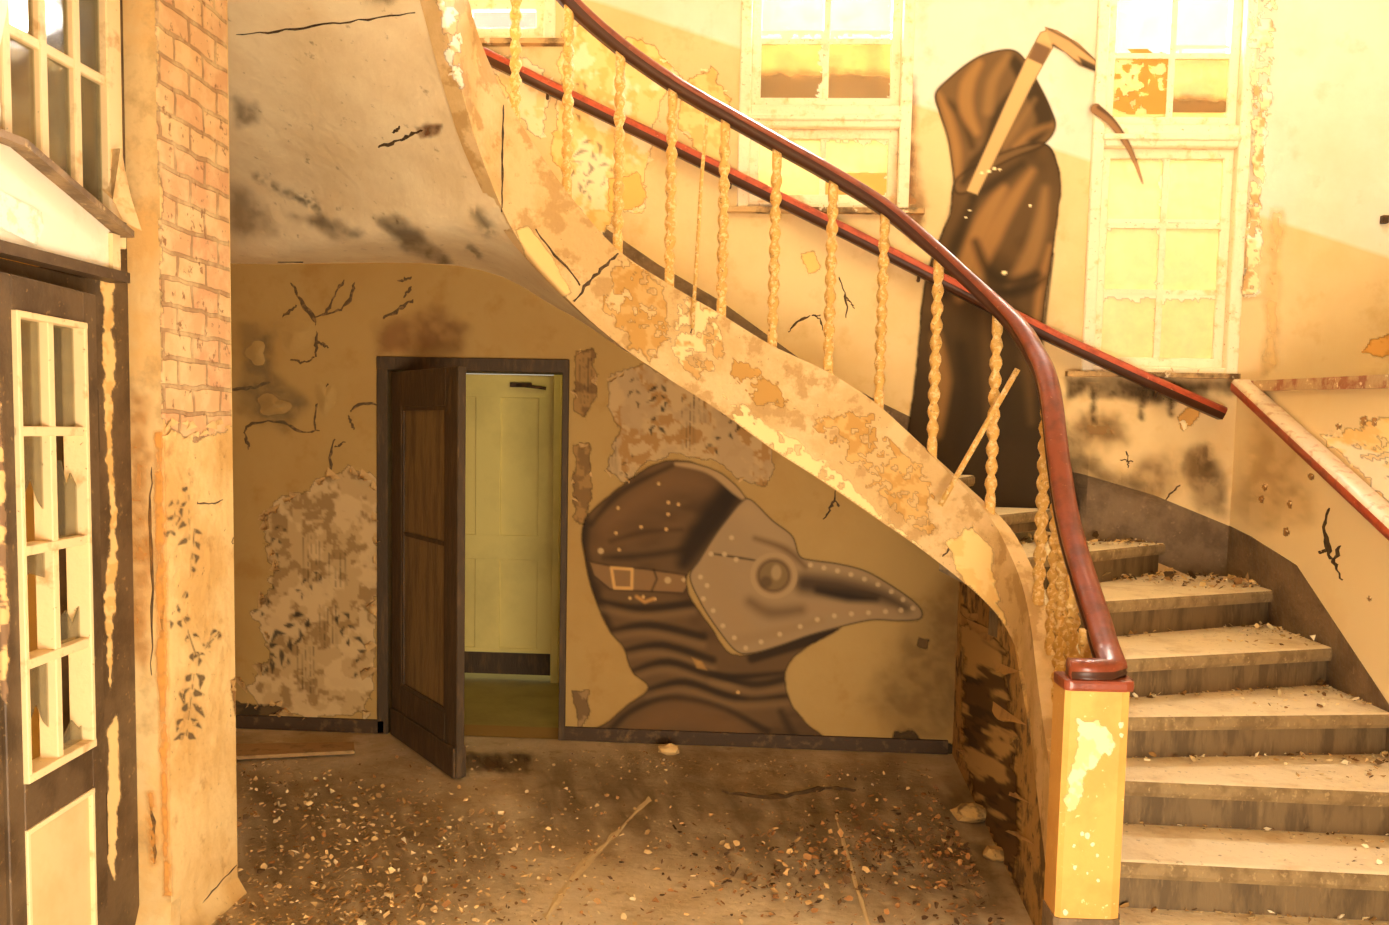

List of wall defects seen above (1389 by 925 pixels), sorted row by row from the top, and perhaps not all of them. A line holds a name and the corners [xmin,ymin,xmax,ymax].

crack [236,12,415,35]
crack [378,126,423,148]
crack [383,277,413,319]
peeling [516,226,570,297]
crack [232,262,377,470]
peeling [100,281,118,687]
peeling [1321,416,1389,501]
peeling [230,465,380,720]
peeling [570,259,1034,895]
crack [1318,508,1343,580]
peeling [107,716,121,880]
peeling [1063,718,1124,811]